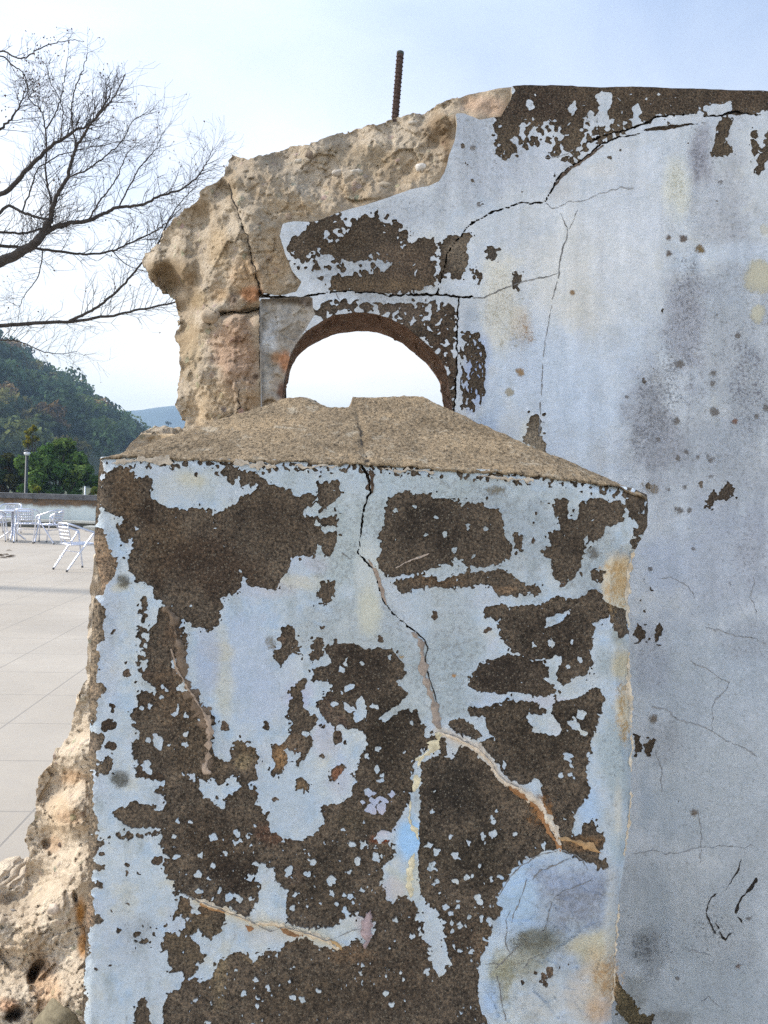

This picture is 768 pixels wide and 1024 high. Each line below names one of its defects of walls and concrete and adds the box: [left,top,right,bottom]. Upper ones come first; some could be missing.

rust [391,50,404,122]
spalling [124,85,768,452]
crack [220,110,758,437]
crack [183,893,358,951]
spalling [0,455,663,1024]
crack [357,423,601,898]